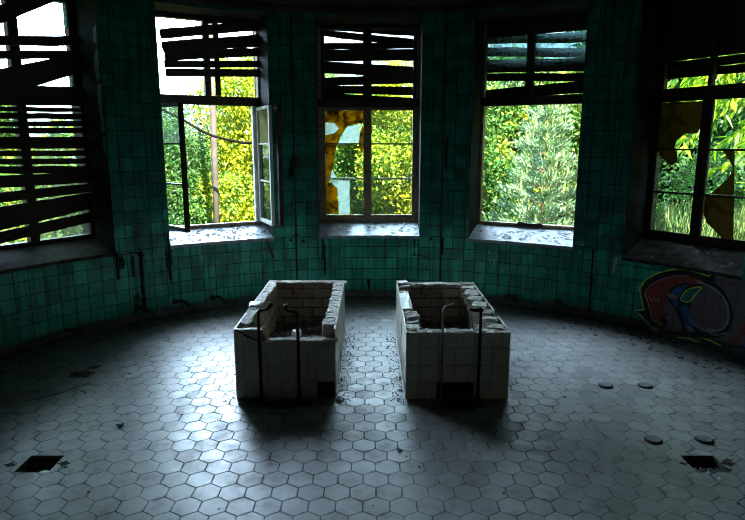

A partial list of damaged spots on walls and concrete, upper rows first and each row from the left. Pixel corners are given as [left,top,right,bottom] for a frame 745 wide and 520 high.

spalling [4,456,71,472]
spalling [679,456,735,472]